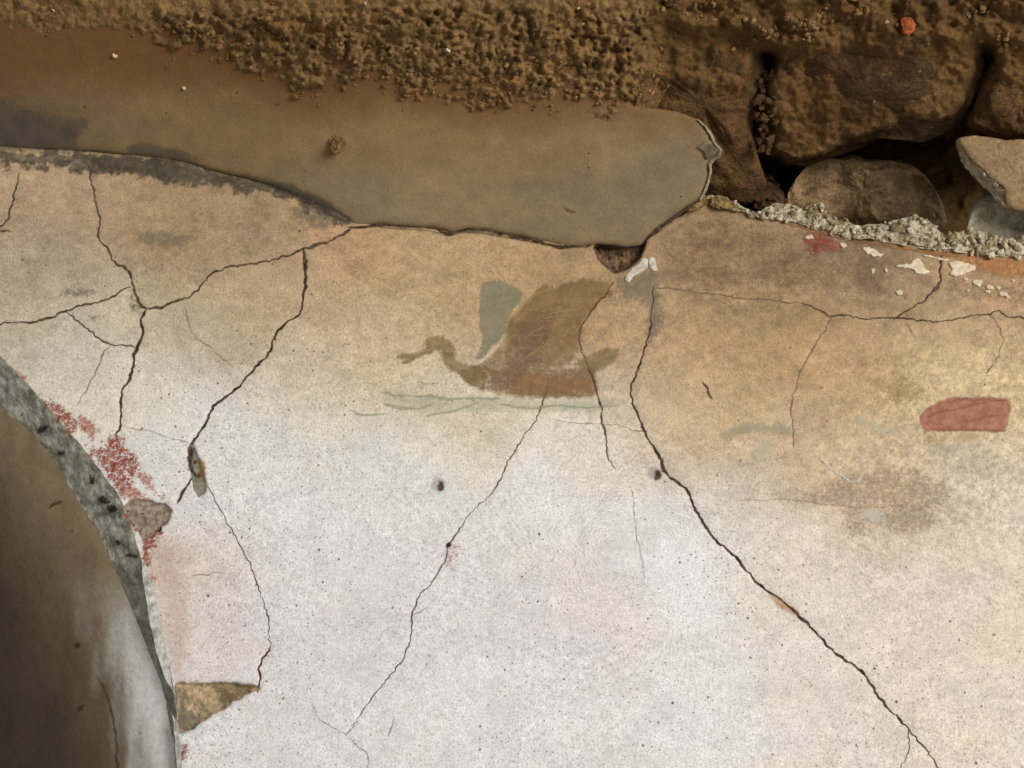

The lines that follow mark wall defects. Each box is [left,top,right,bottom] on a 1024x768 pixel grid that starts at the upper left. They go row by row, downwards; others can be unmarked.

crack [645,200,699,243]
crack [0,165,592,445]
peeling [37,394,101,442]
flaking render [98,472,173,579]
crack [313,250,1024,768]
crack [177,478,272,692]
crack [98,678,119,768]
flaking render [175,682,260,759]